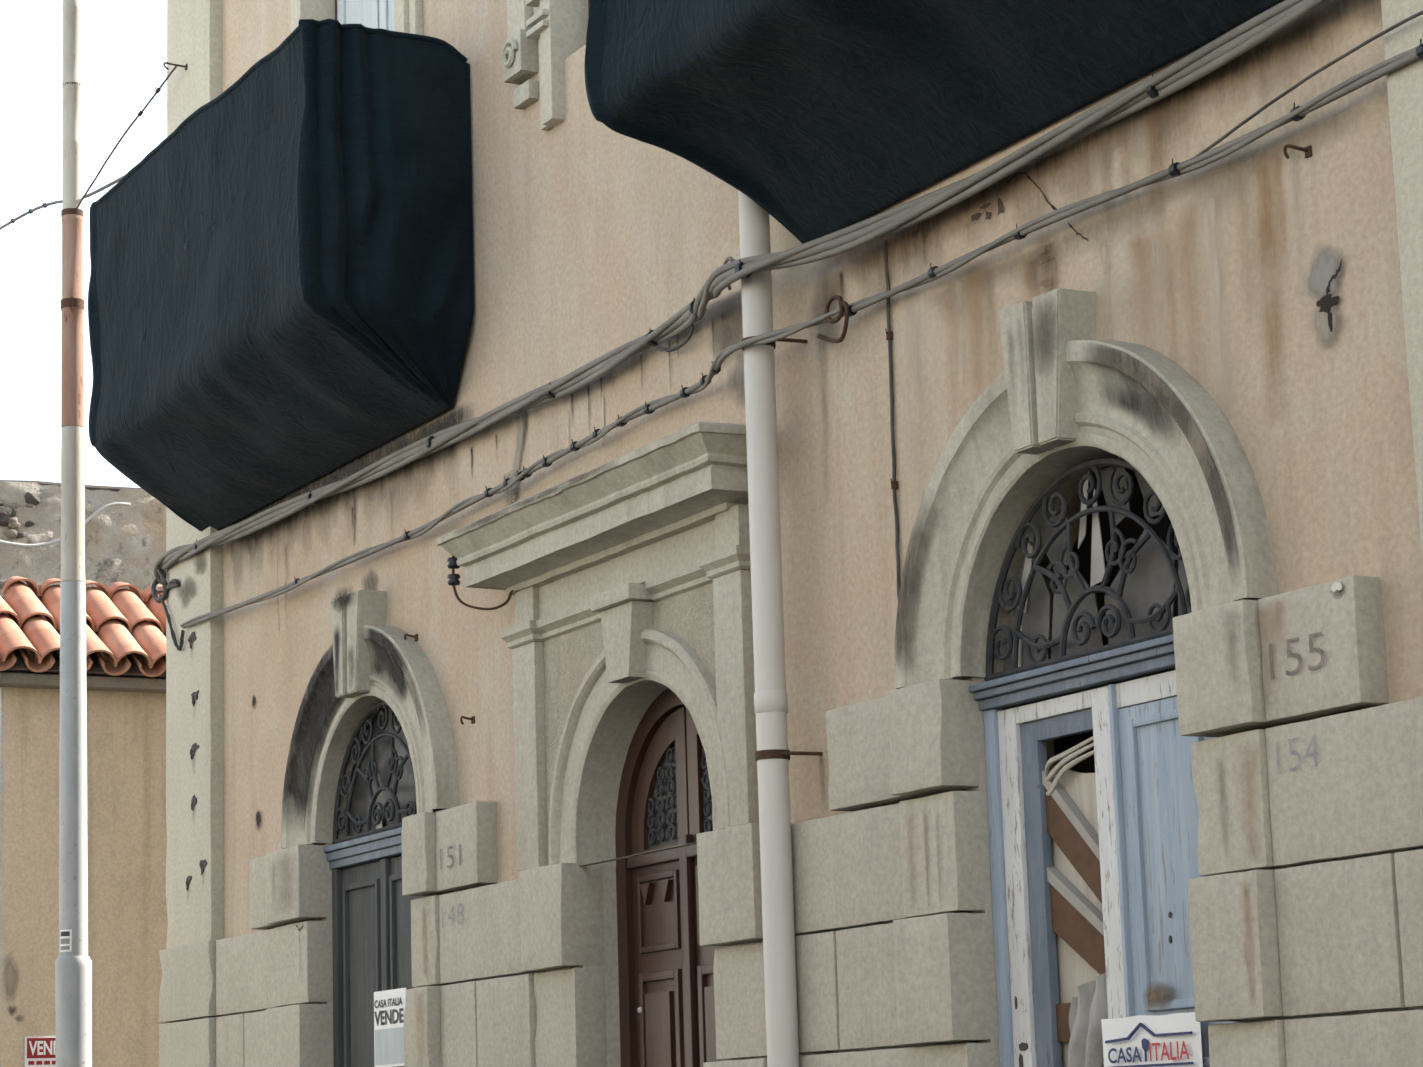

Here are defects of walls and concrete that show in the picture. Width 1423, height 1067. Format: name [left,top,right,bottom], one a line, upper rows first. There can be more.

spalling [1308,249,1342,344]
leakage [334,590,347,609]
leakage [367,629,418,711]
leakage [282,632,352,812]